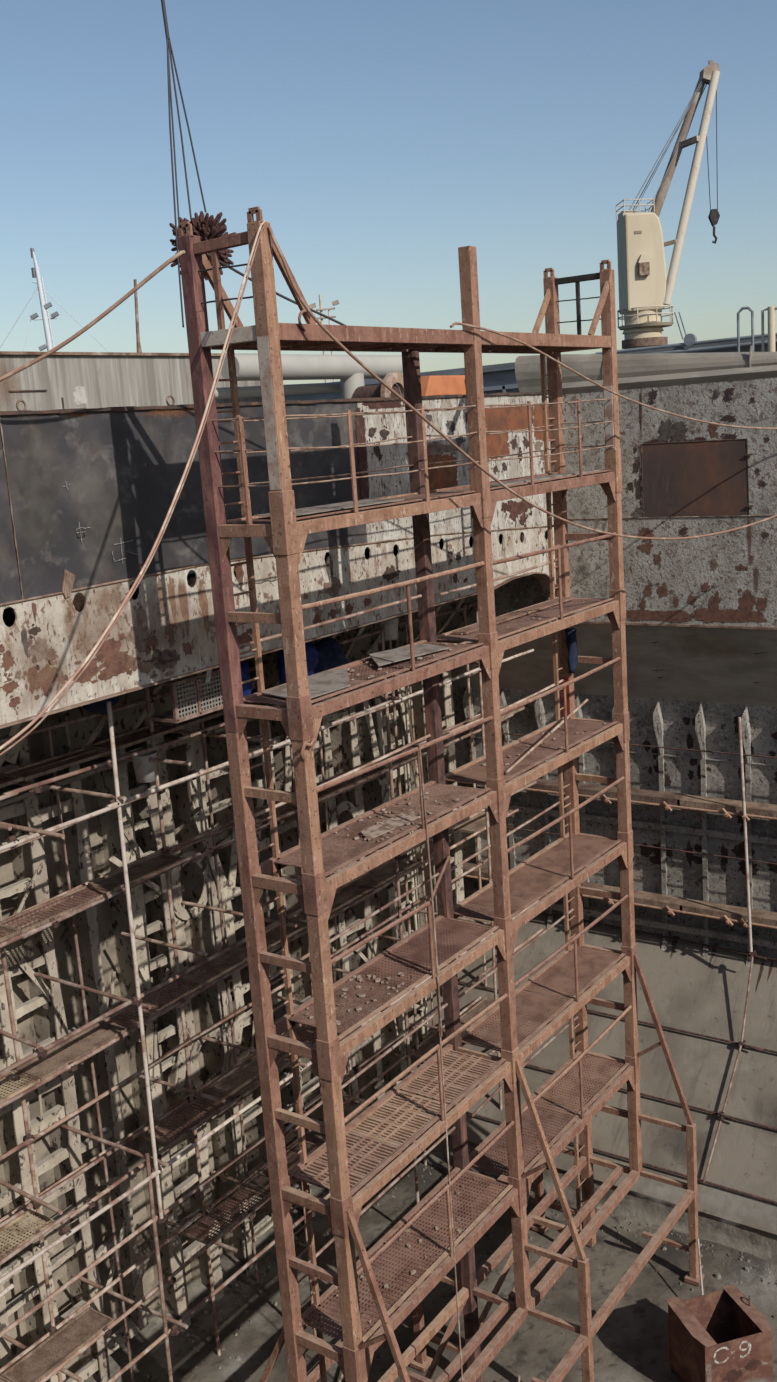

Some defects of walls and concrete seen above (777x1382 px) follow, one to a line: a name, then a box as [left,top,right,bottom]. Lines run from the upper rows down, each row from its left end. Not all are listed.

peeling [355,408,390,499]
peeling [491,435,551,474]
peeling [627,388,737,504]
rust [707,421,720,440]
peeling [501,500,533,527]
peeling [382,565,401,584]
peeling [448,550,468,583]
peeling [638,527,748,613]
peeling [313,576,370,627]
peeling [739,588,767,616]
peeling [0,602,193,709]